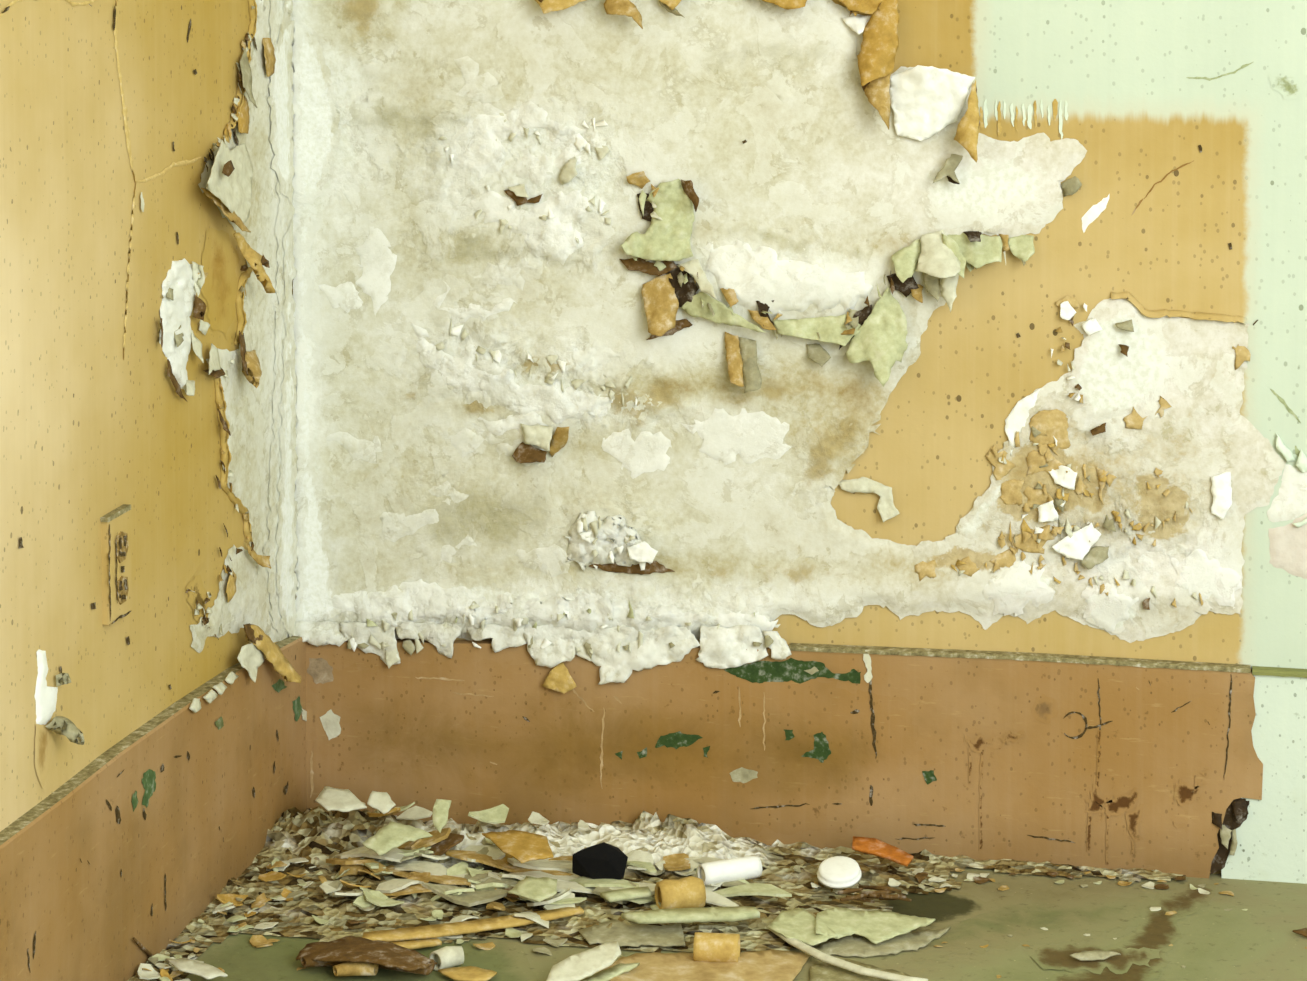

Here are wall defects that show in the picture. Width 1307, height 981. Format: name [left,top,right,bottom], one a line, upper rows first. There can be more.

crack [0,0,23,17]
crack [66,0,202,353]
peeling [159,0,1307,740]
peeling [34,650,85,788]
spalling [1210,798,1249,874]